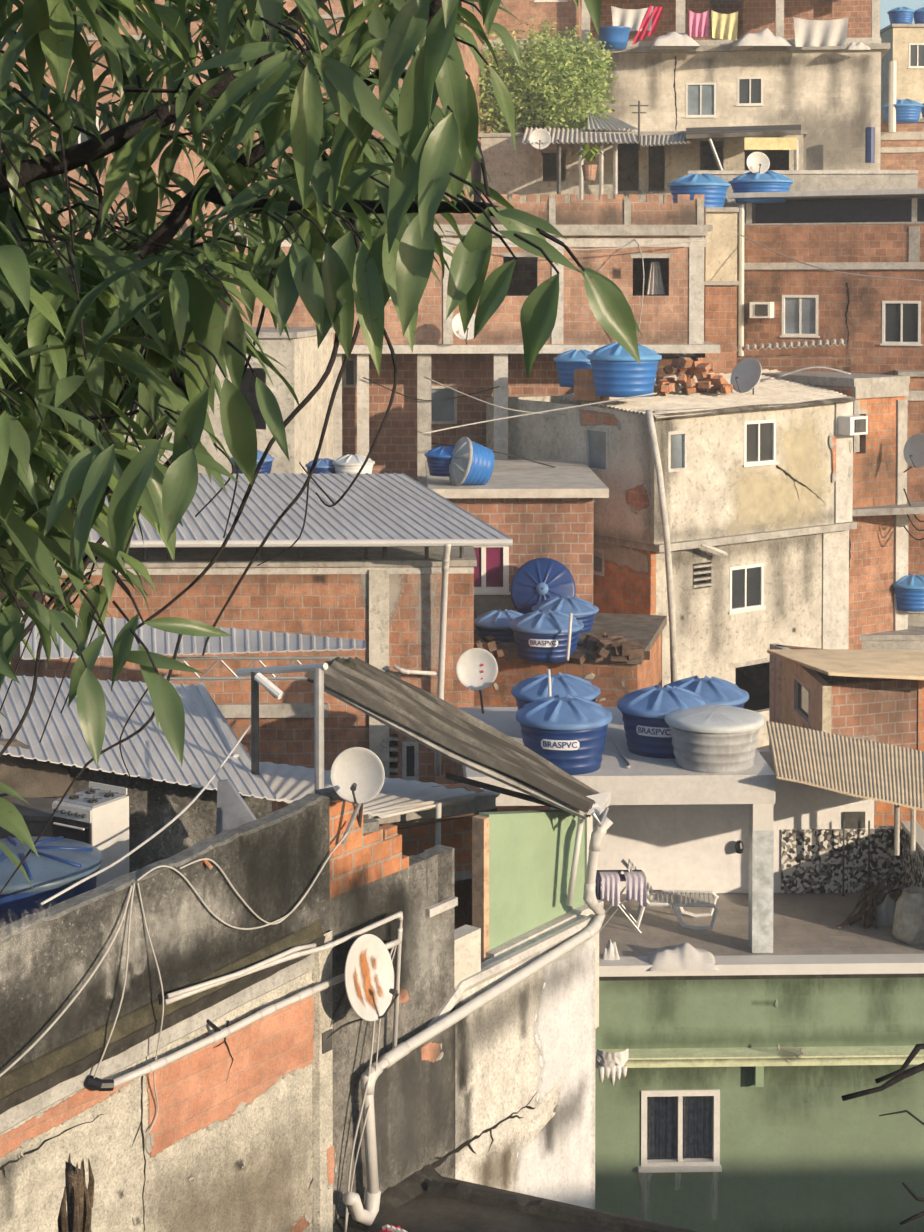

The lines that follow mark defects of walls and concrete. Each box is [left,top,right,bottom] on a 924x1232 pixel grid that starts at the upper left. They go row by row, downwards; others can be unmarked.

flaking render [624,480,649,514]
crack [776,465,825,503]
damp [335,881,409,980]
damp [0,925,301,1060]
flaking render [0,1080,132,1160]
crack [132,1076,146,1231]
flaking render [145,985,314,1157]
crack [431,1091,538,1168]
peeling [515,936,596,1209]